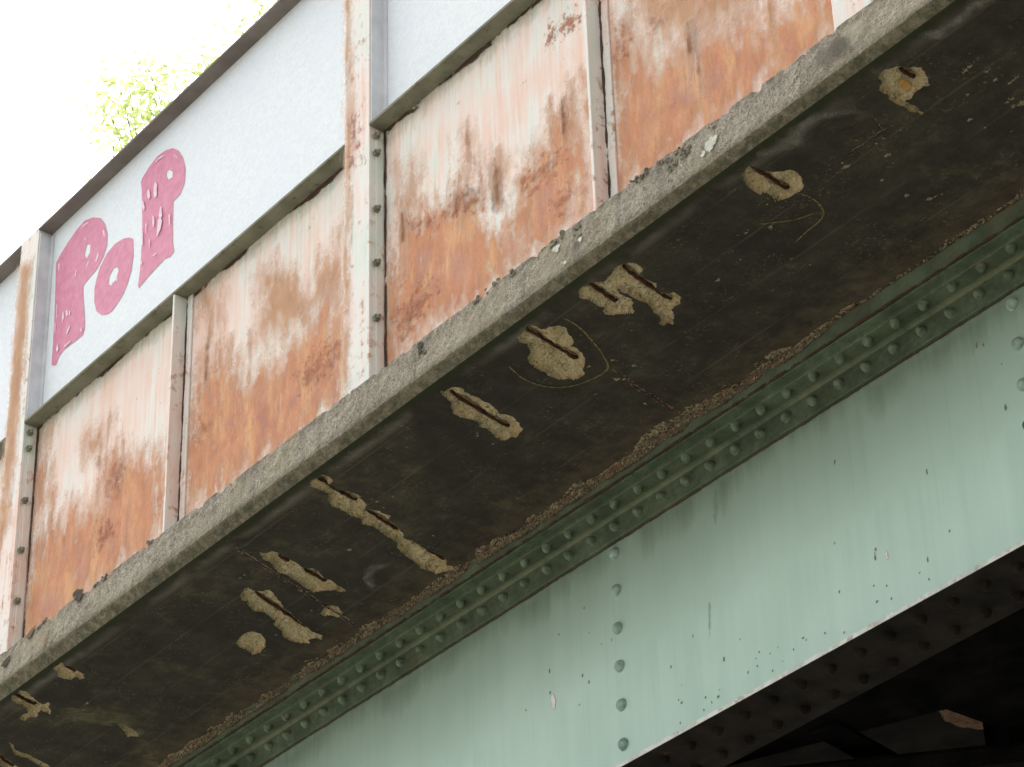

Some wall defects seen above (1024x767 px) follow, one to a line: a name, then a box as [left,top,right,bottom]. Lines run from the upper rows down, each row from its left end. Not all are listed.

rust [177,0,362,521]
rust [383,67,593,367]
rust [598,0,835,198]
spalling [742,166,804,230]
spalling [878,66,930,115]
rust [22,392,167,638]
spalling [159,189,1024,767]
rust [178,216,1024,767]
spalling [11,690,51,721]
spalling [53,662,84,680]